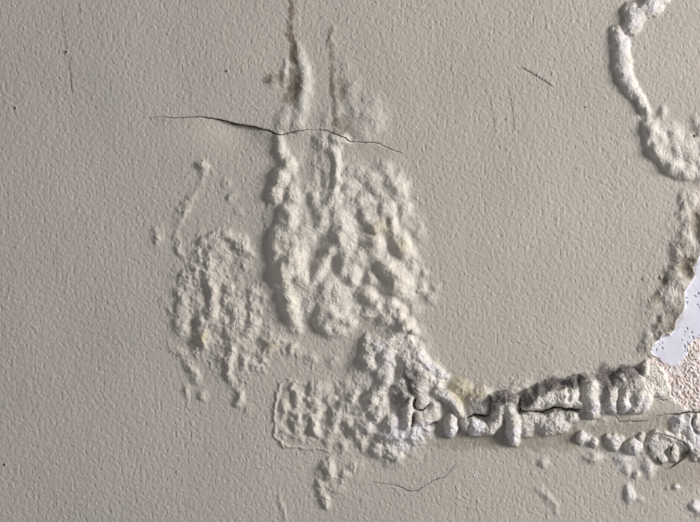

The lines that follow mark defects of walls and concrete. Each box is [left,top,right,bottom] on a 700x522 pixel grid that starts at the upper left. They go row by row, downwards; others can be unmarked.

crack [148,116,401,153]
peeling [637,189,700,410]
crack [519,398,580,413]